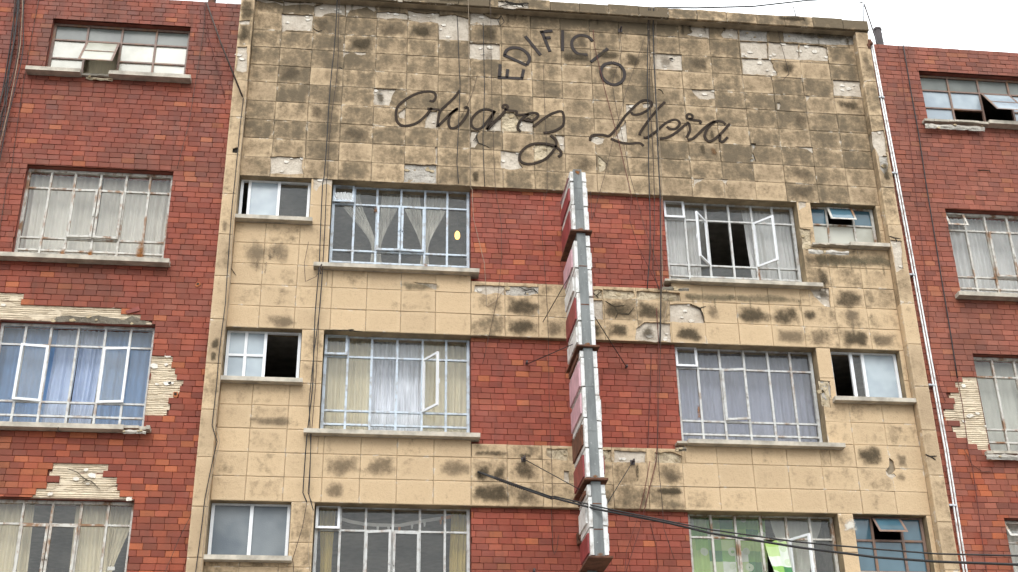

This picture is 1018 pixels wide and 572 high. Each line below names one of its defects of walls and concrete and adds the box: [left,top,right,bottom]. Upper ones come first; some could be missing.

spalling [498,1,528,9]
spalling [257,0,500,60]
spalling [688,27,709,38]
spalling [653,54,682,70]
spalling [721,29,853,76]
spalling [470,113,533,148]
spalling [404,147,437,183]
spalling [501,151,522,170]
spalling [534,136,565,161]
spalling [51,315,146,325]
spalling [593,286,704,342]